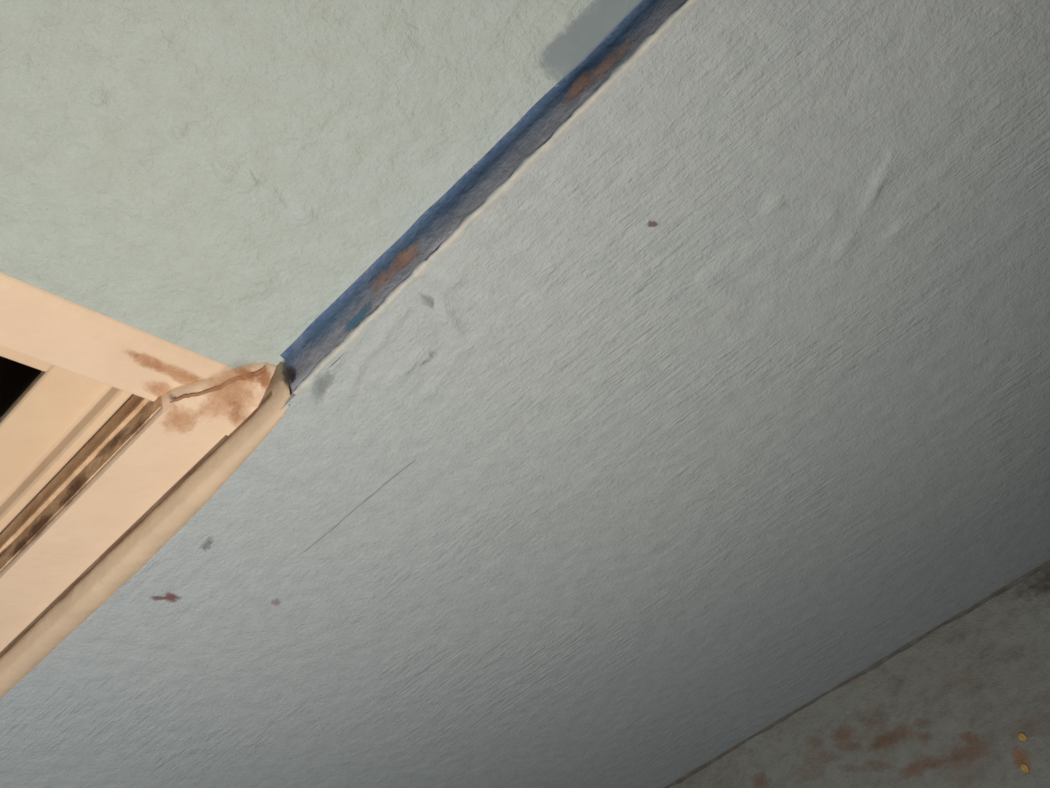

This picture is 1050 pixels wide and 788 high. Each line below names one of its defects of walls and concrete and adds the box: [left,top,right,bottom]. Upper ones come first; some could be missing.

crack [664,560,1050,788]